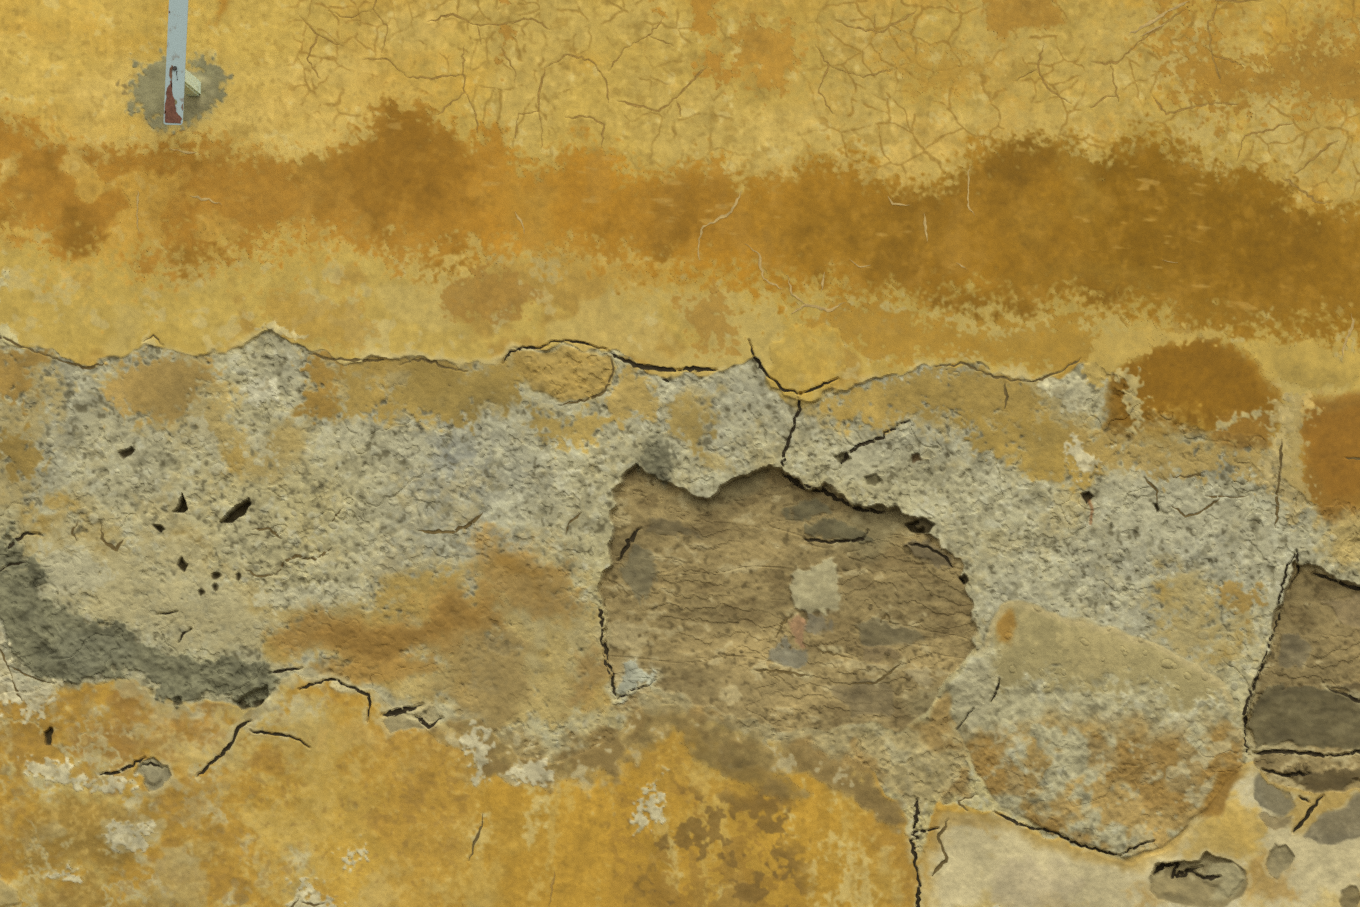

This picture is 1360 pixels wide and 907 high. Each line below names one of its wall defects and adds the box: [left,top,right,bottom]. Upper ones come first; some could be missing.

corrosion [164,65,183,123]
leakage [0,98,1360,457]
crack [0,337,104,369]
crack [936,358,1081,409]
leakage [1291,392,1360,525]
crack [598,605,653,699]
spalling [0,332,1360,879]
crack [1145,443,1360,832]
crack [100,758,162,775]
crack [197,721,310,776]
crack [909,794,1220,907]
spalling [1151,852,1248,907]